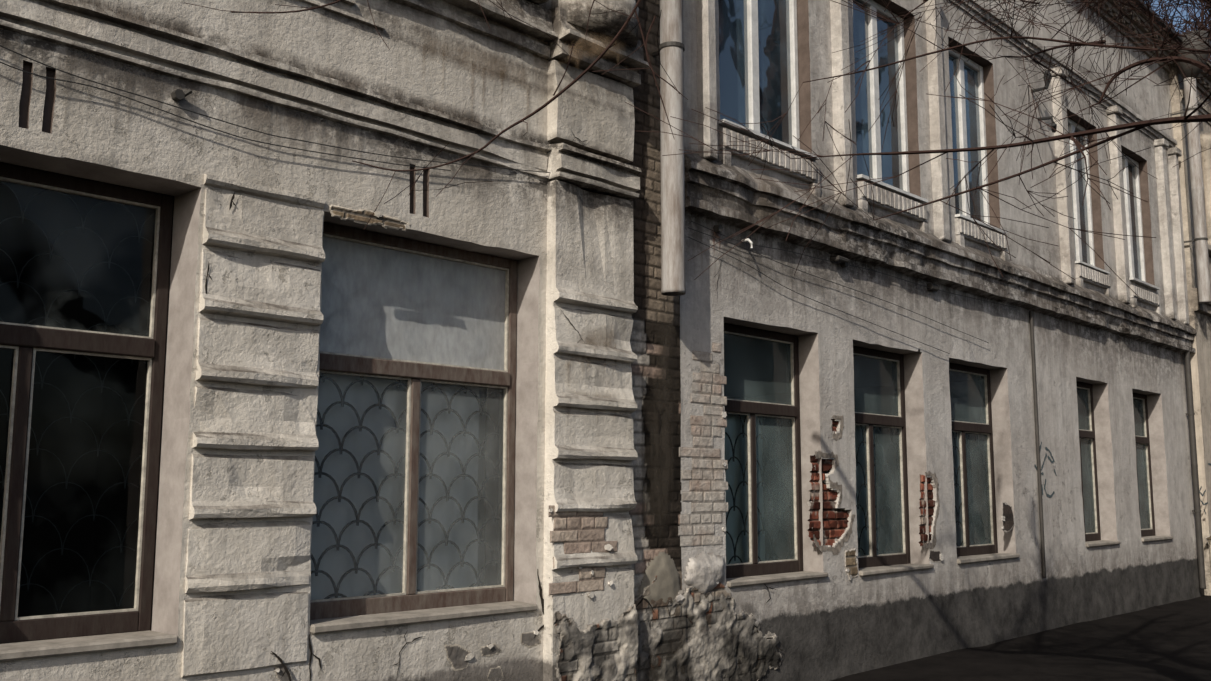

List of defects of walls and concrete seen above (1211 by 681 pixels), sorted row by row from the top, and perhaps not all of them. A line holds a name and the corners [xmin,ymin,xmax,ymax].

spalling [678,342,728,546]
spalling [548,505,618,598]
spalling [807,455,858,580]
spalling [918,475,944,563]
peeling [444,643,504,681]
peeling [520,630,541,648]
spalling [553,575,782,681]